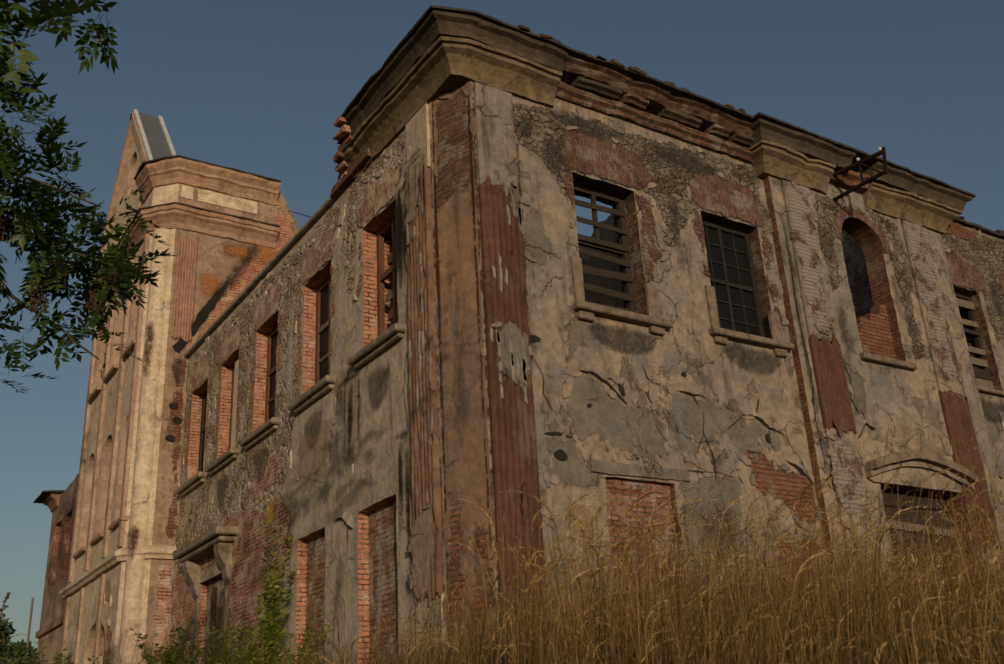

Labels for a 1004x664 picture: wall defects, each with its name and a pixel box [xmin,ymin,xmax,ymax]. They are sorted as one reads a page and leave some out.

peeling [491,255,508,293]
spalling [785,181,927,360]
spalling [151,133,424,664]
peeling [408,330,433,435]
spalling [490,321,541,404]
crack [534,359,573,438]
spalling [842,357,869,415]
spalling [663,387,821,594]
spalling [406,491,498,628]